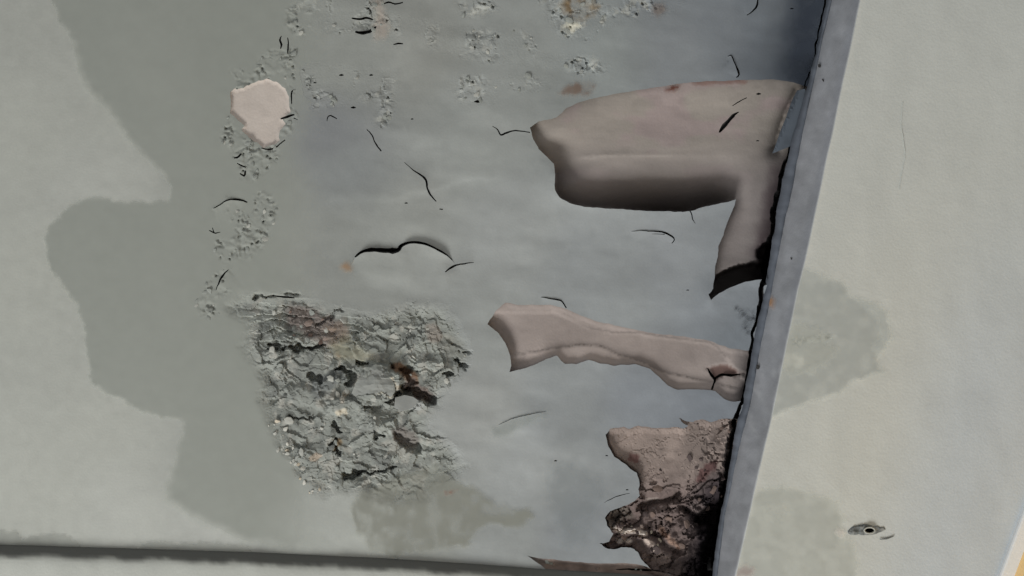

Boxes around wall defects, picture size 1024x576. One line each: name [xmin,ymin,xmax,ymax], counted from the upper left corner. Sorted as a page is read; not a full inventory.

damp [44,0,303,552]
peeling [230,79,290,148]
spalling [194,269,475,511]
crack [355,241,474,272]
crack [405,163,443,210]
flaking render [488,303,760,402]
crack [640,230,675,243]
flaking render [530,79,807,300]
crack [707,147,790,570]
damp [773,269,890,416]
damp [352,466,534,558]
flaking render [529,418,737,576]